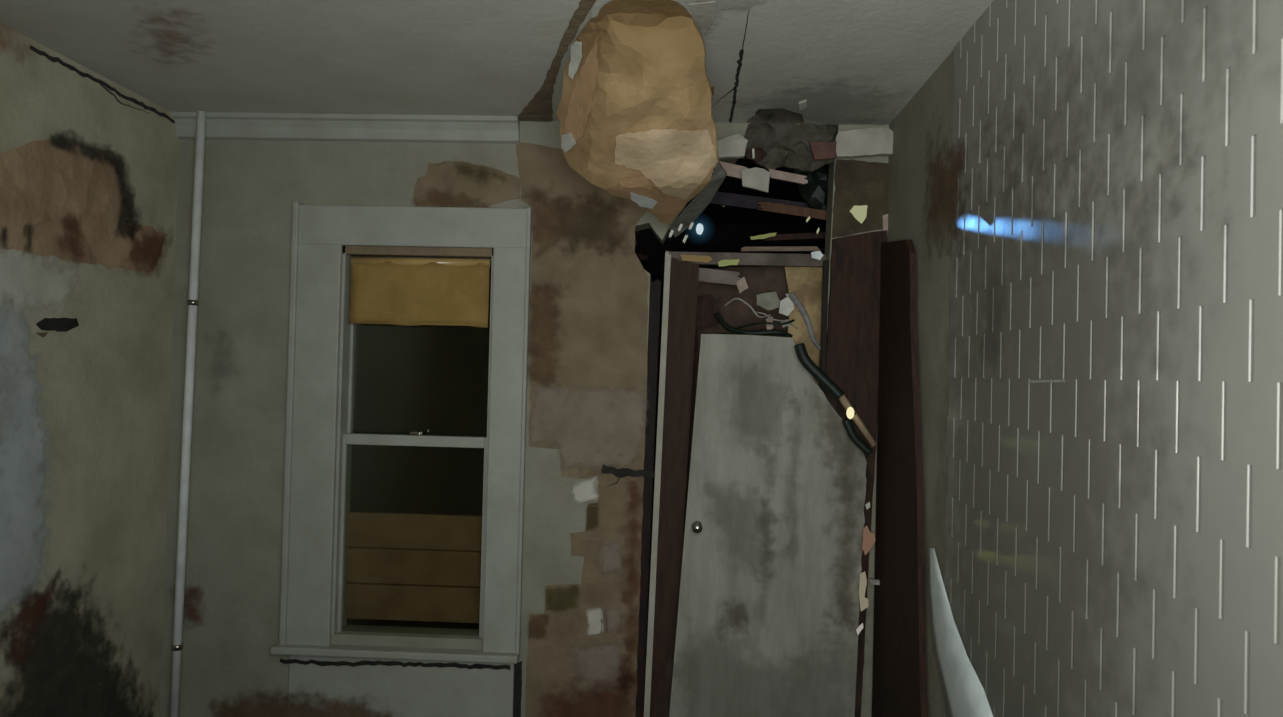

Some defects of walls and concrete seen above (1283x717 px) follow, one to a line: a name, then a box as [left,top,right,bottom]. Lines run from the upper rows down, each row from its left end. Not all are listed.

crack [30,45,175,123]
crack [712,6,750,123]
spalling [414,142,649,717]
leakage [1,575,153,717]